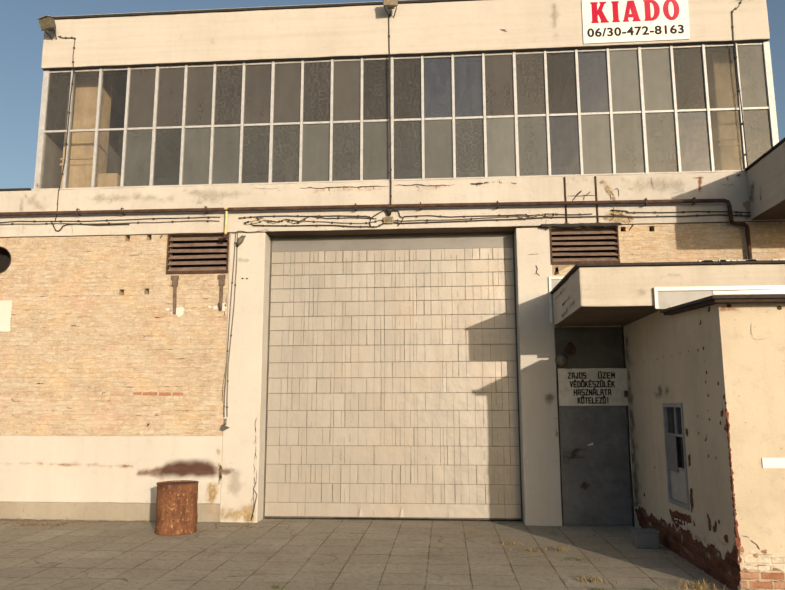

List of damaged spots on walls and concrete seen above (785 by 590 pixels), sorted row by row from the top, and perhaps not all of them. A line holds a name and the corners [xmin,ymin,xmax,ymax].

spalling [603,211,634,224]
rust [138,461,231,476]
peeling [634,394,785,590]
leakage [222,506,253,521]